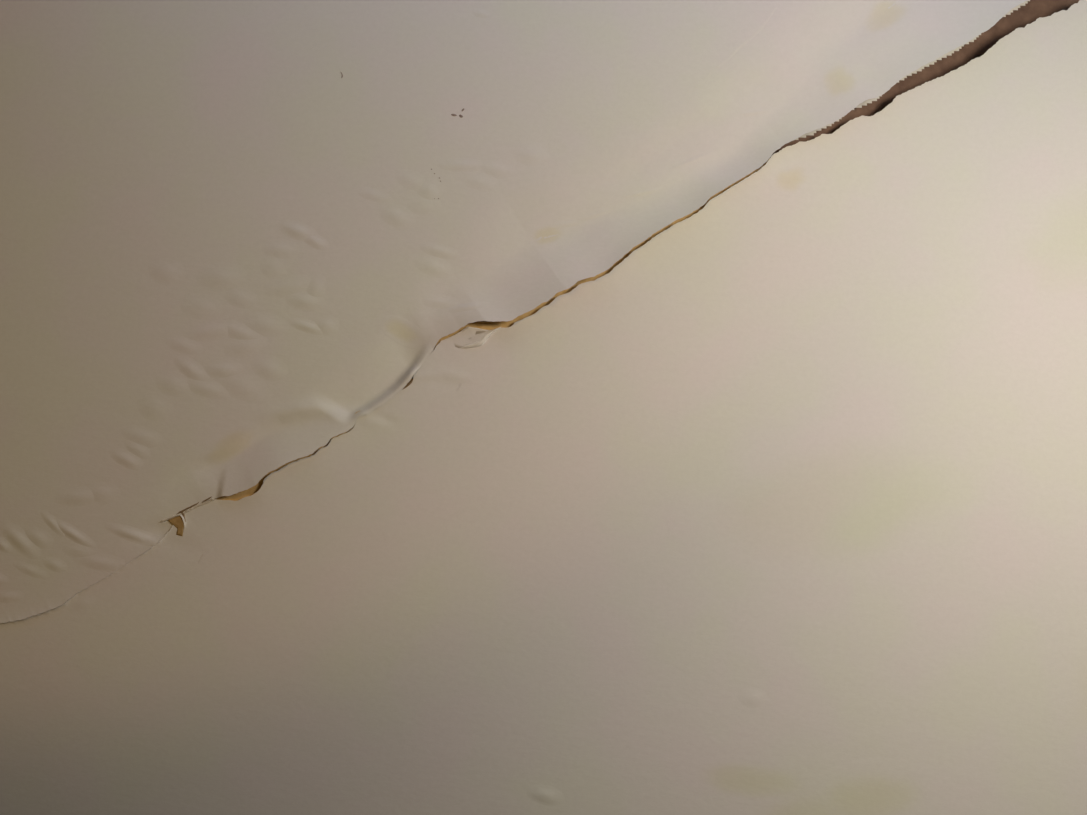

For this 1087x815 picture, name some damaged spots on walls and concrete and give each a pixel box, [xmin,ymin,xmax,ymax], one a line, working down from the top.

peeling [392,0,1027,349]
peeling [135,374,336,541]